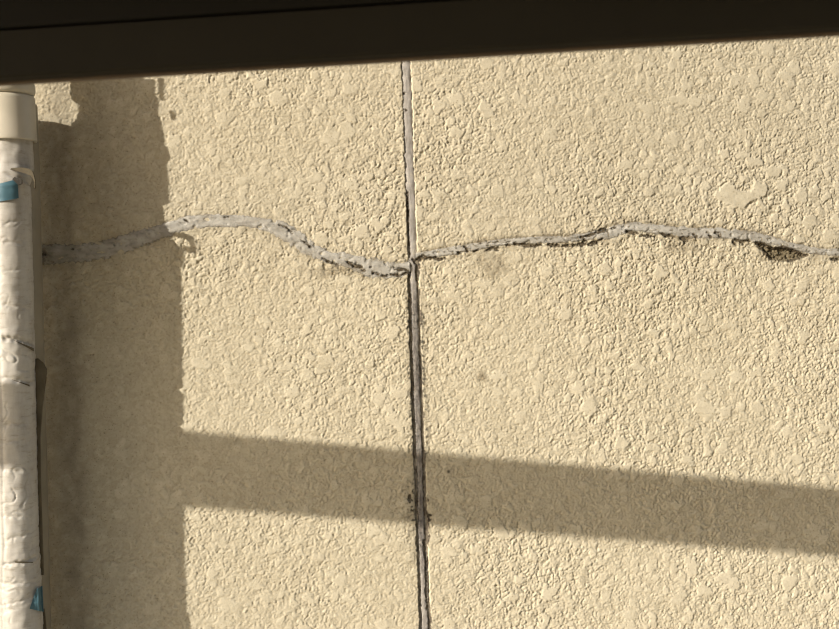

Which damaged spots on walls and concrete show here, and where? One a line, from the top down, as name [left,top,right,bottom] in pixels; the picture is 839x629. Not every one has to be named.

crack [42,214,839,279]
spalling [755,241,805,262]